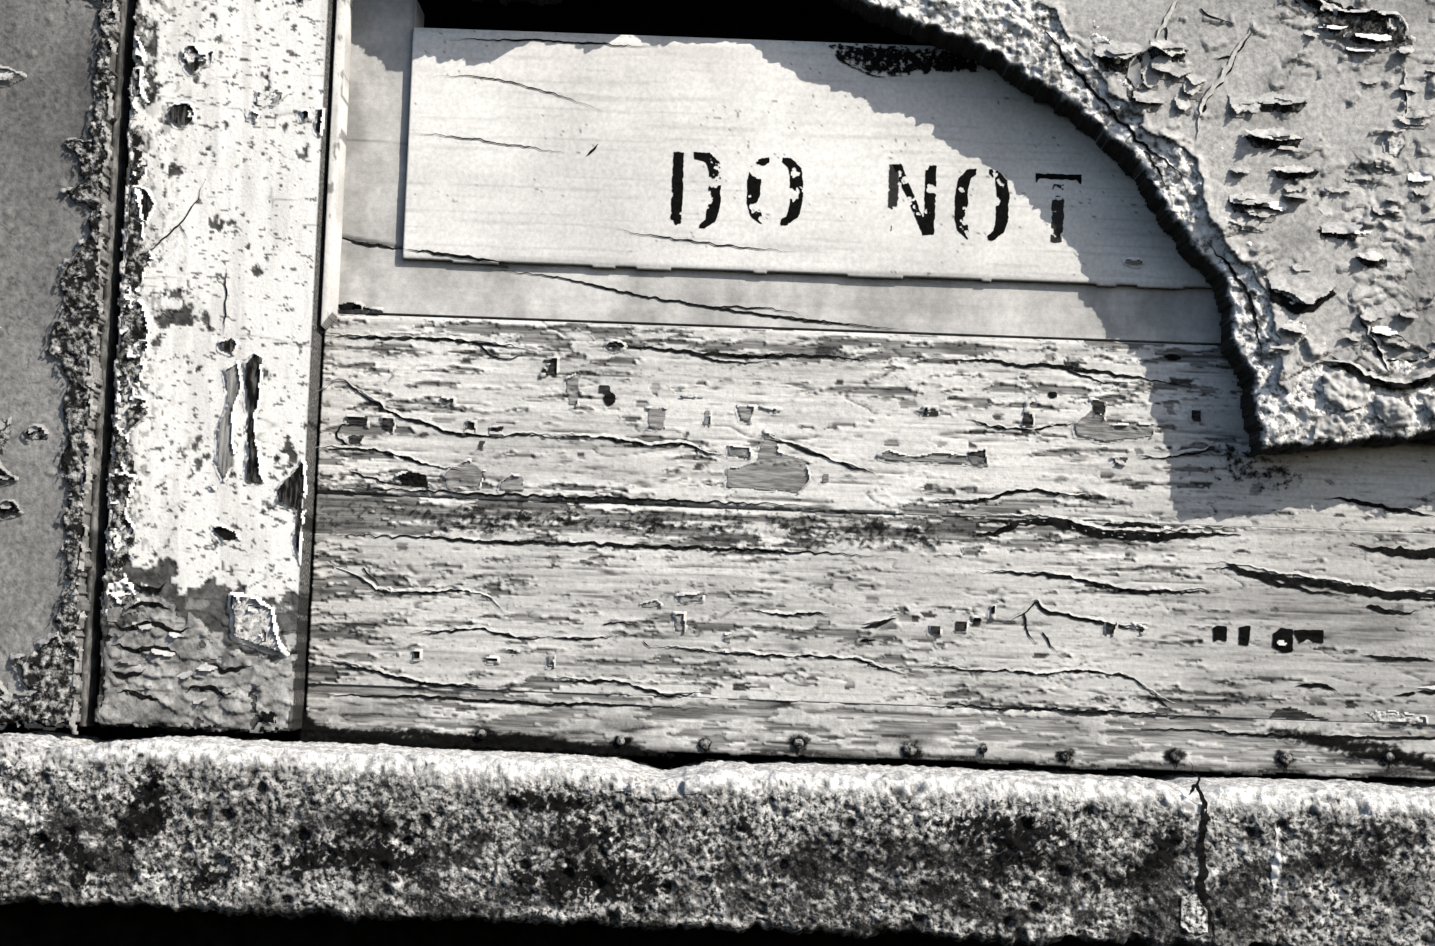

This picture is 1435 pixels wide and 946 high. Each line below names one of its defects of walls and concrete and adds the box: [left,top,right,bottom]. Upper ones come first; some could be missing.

peeling [299,108,325,137]
spalling [833,0,1435,456]
peeling [97,35,298,733]
peeling [539,356,580,407]
peeling [345,413,396,446]
peeling [395,418,525,493]
peeling [725,403,829,495]
peeling [876,447,990,467]
peeling [1073,397,1155,467]
peeling [928,604,997,637]
damp [0,796,51,831]
damp [1271,828,1282,891]